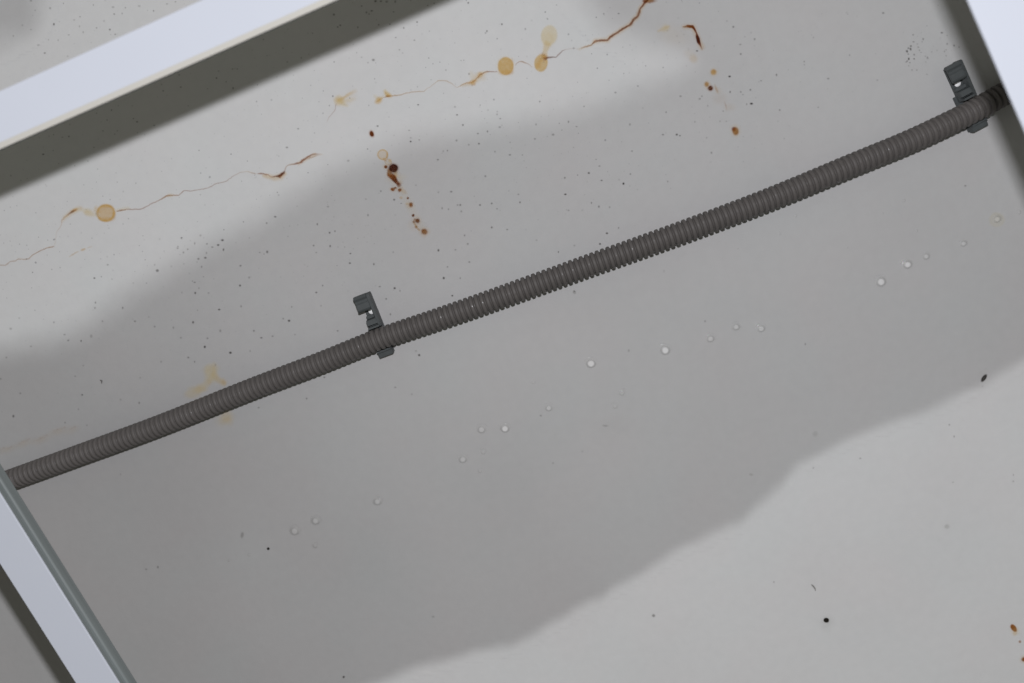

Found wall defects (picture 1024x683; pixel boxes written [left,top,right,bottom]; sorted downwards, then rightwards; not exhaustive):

leakage [0,0,1002,471]
leakage [0,564,76,683]